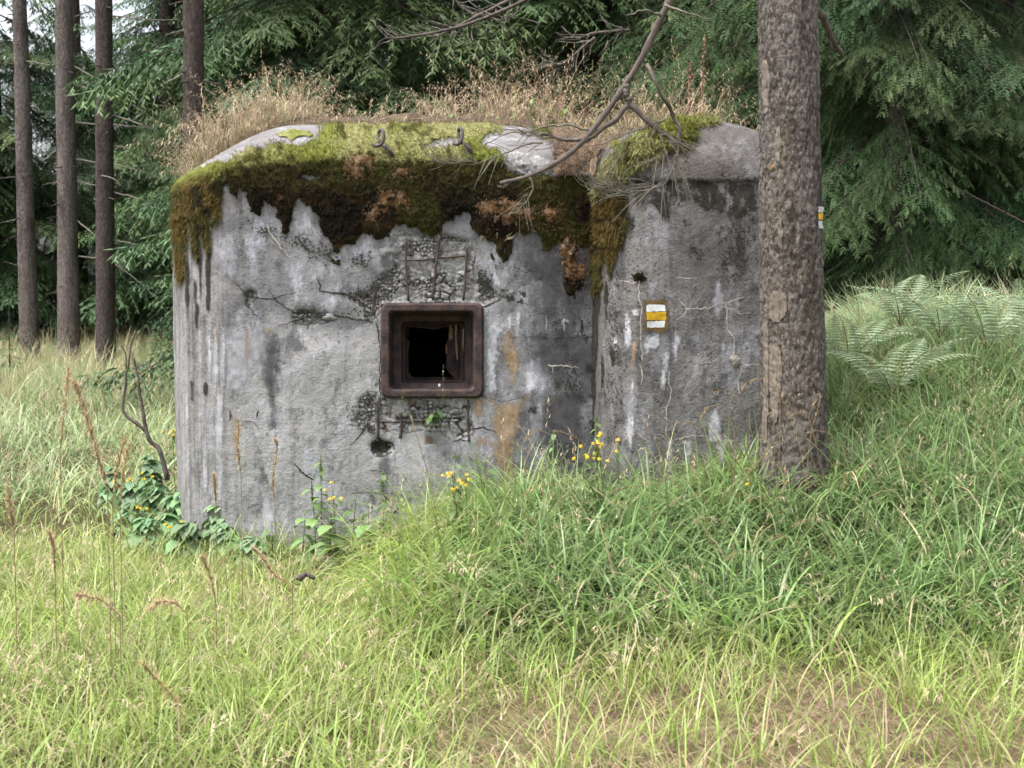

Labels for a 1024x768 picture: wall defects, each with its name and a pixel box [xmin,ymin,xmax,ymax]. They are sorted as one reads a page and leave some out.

spalling [345,231,514,321]
leakage [185,235,278,500]
crack [234,278,381,395]
leakage [644,332,680,386]
spalling [348,390,474,456]
rust [475,395,531,480]